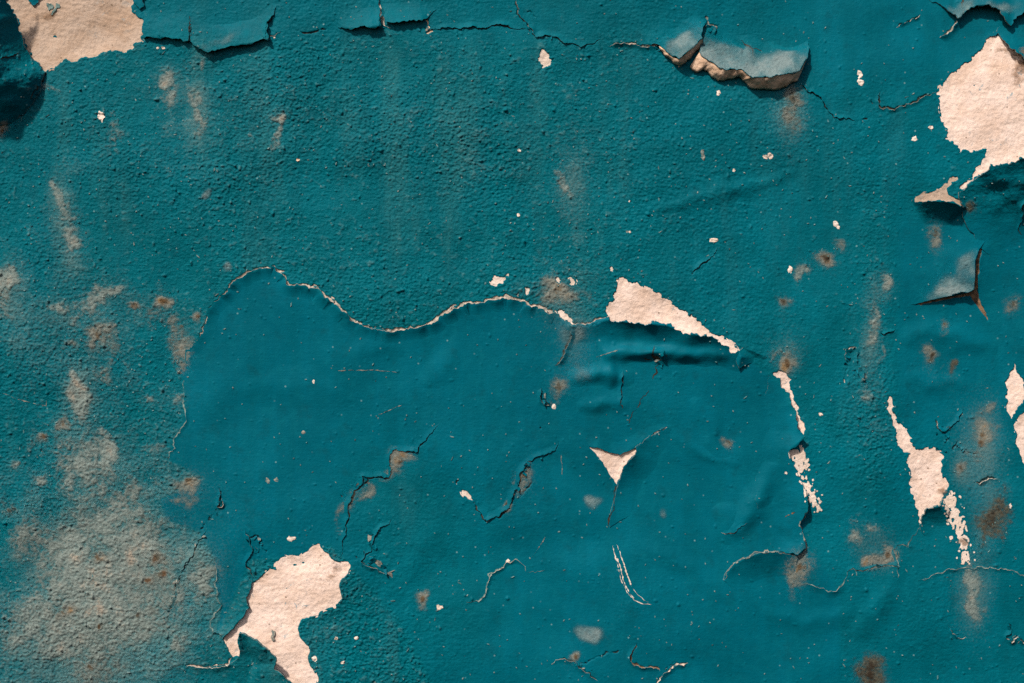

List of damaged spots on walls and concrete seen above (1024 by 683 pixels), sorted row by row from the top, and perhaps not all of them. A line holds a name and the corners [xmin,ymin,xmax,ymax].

peeling [7,0,144,71]
crack [418,0,661,54]
peeling [915,36,1024,206]
crack [335,425,438,577]
crack [168,266,610,459]
crack [474,388,559,522]
peeling [590,447,636,484]
peeling [606,267,739,353]
crack [725,512,808,579]
peeling [887,397,976,563]
peeling [1005,365,1024,463]
peeling [224,544,351,683]